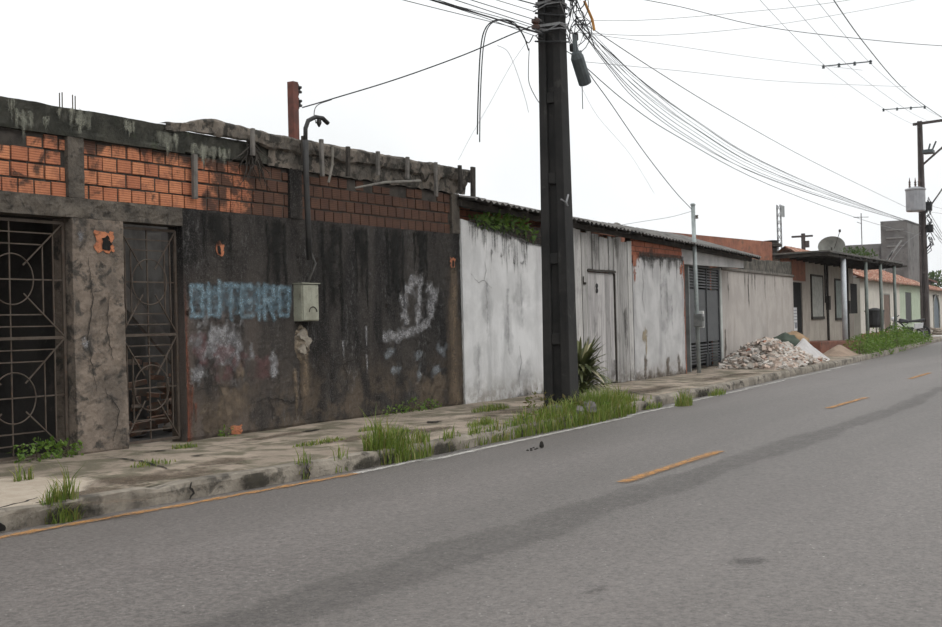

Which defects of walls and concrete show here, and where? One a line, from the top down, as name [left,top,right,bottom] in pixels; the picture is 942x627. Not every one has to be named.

spalling [79,230,115,253]